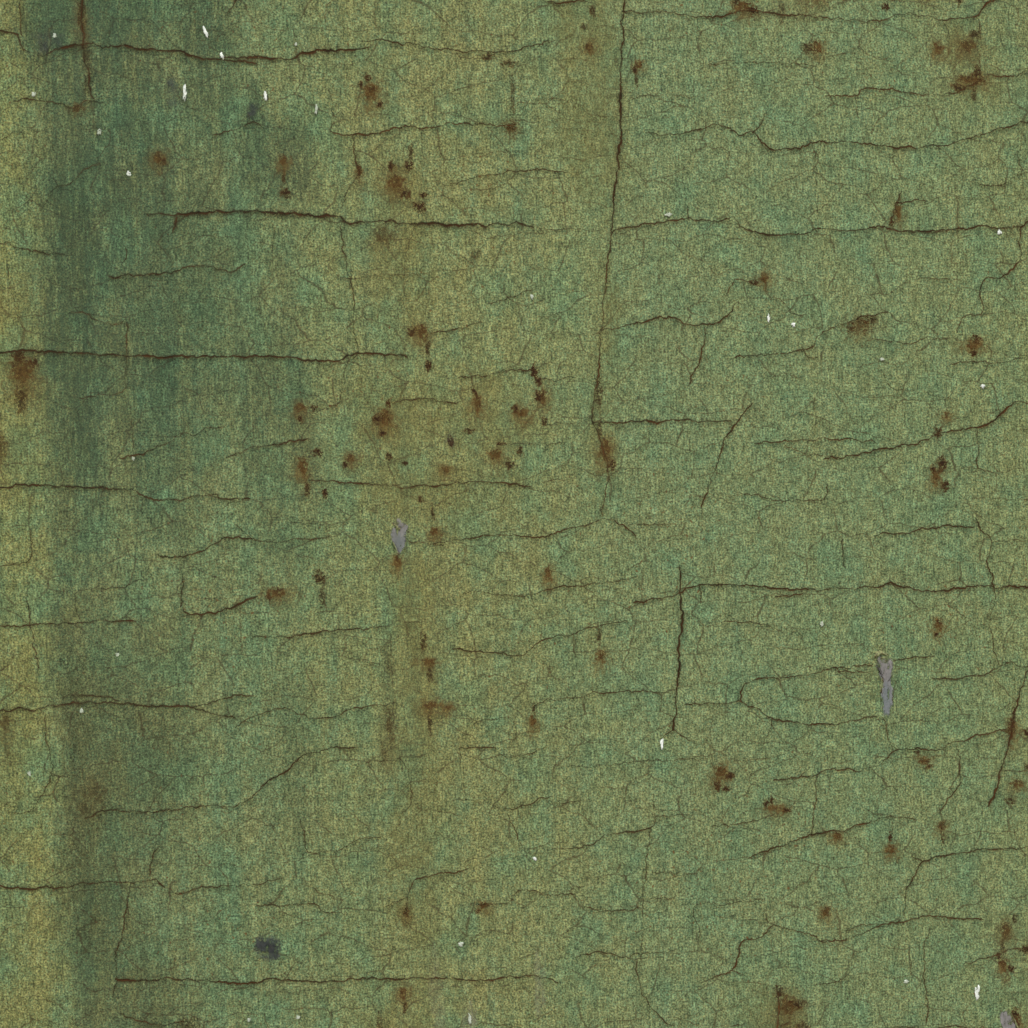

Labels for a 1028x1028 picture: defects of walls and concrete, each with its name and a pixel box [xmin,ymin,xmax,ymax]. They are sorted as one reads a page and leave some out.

rust [934,30,985,100]
rust [386,143,429,212]
rust [530,363,547,404]
rust [297,449,328,498]
rust [489,441,523,470]
rust [930,455,949,492]
peeling [391,519,408,557]
peeling [874,651,893,715]
rust [712,764,735,792]
crack [452,519,1028,1028]
water stain [256,938,280,959]
peeling [1000,1012,1019,1028]